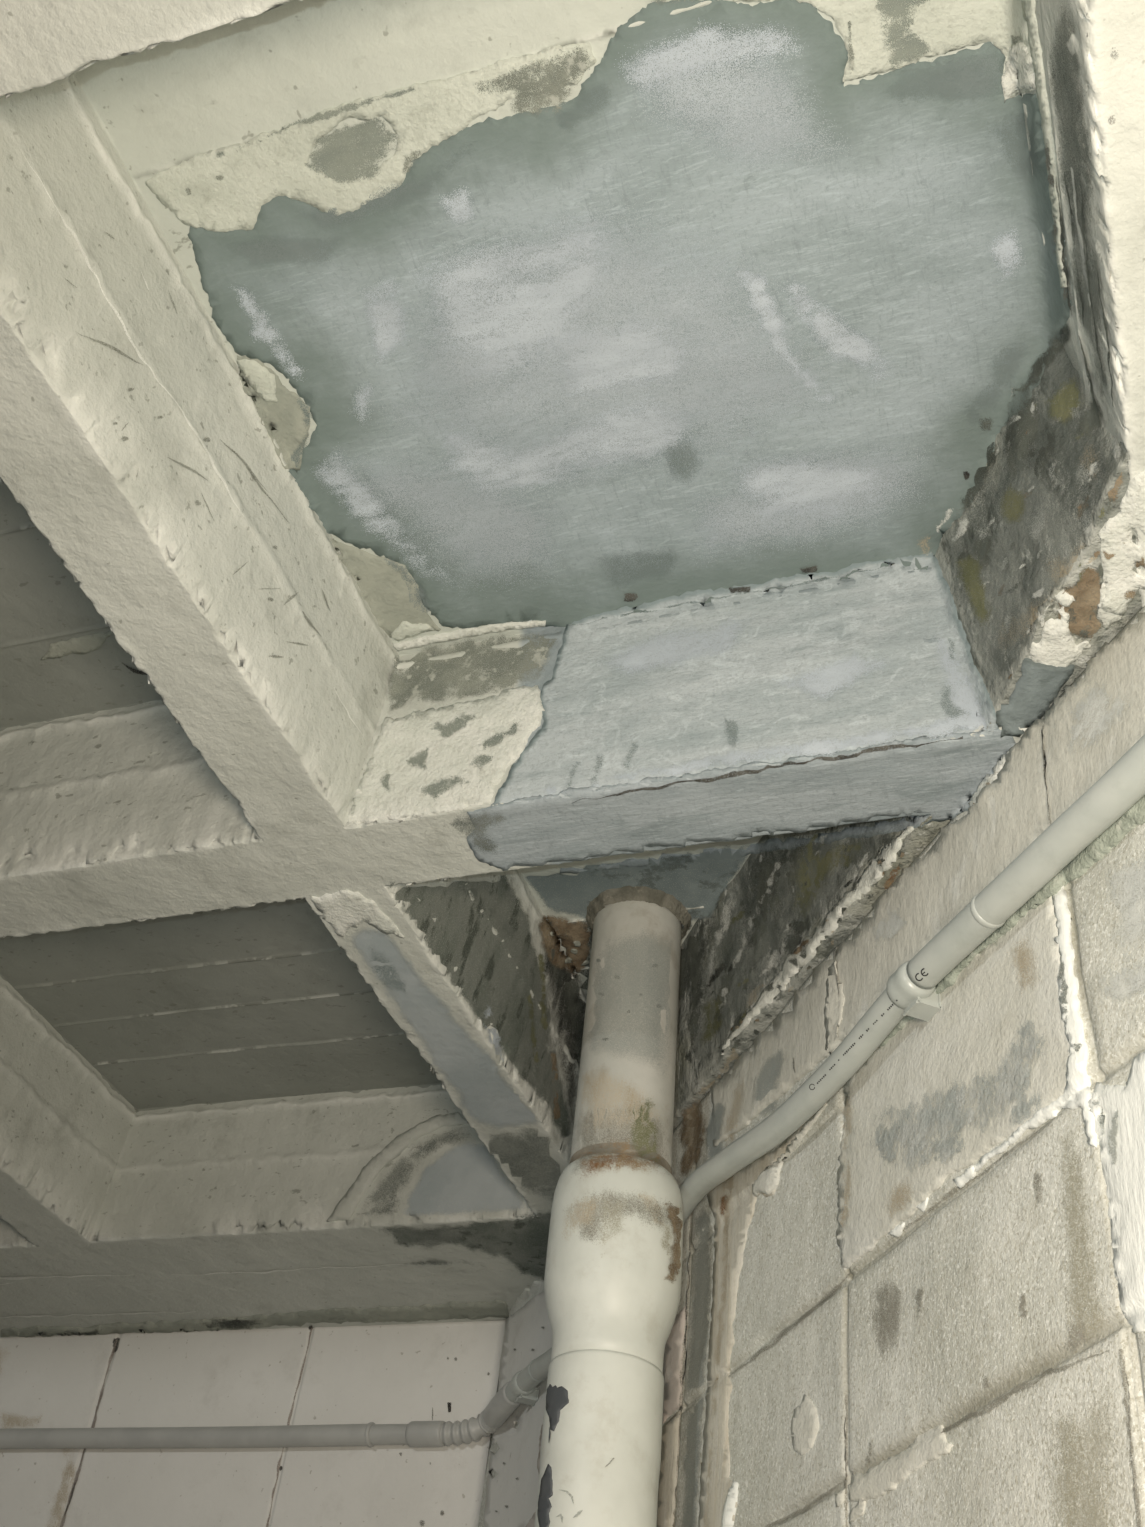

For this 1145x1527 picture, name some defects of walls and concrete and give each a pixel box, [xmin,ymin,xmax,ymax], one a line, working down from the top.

peeling [145,42,596,232]
peeling [797,0,1069,300]
peeling [237,355,312,471]
leakage [917,3,1123,686]
leakage [451,811,505,855]
peeling [696,470,1145,1159]
leakage [357,825,901,1279]
leakage [868,1275,923,1363]
peeling [698,886,1145,1527]